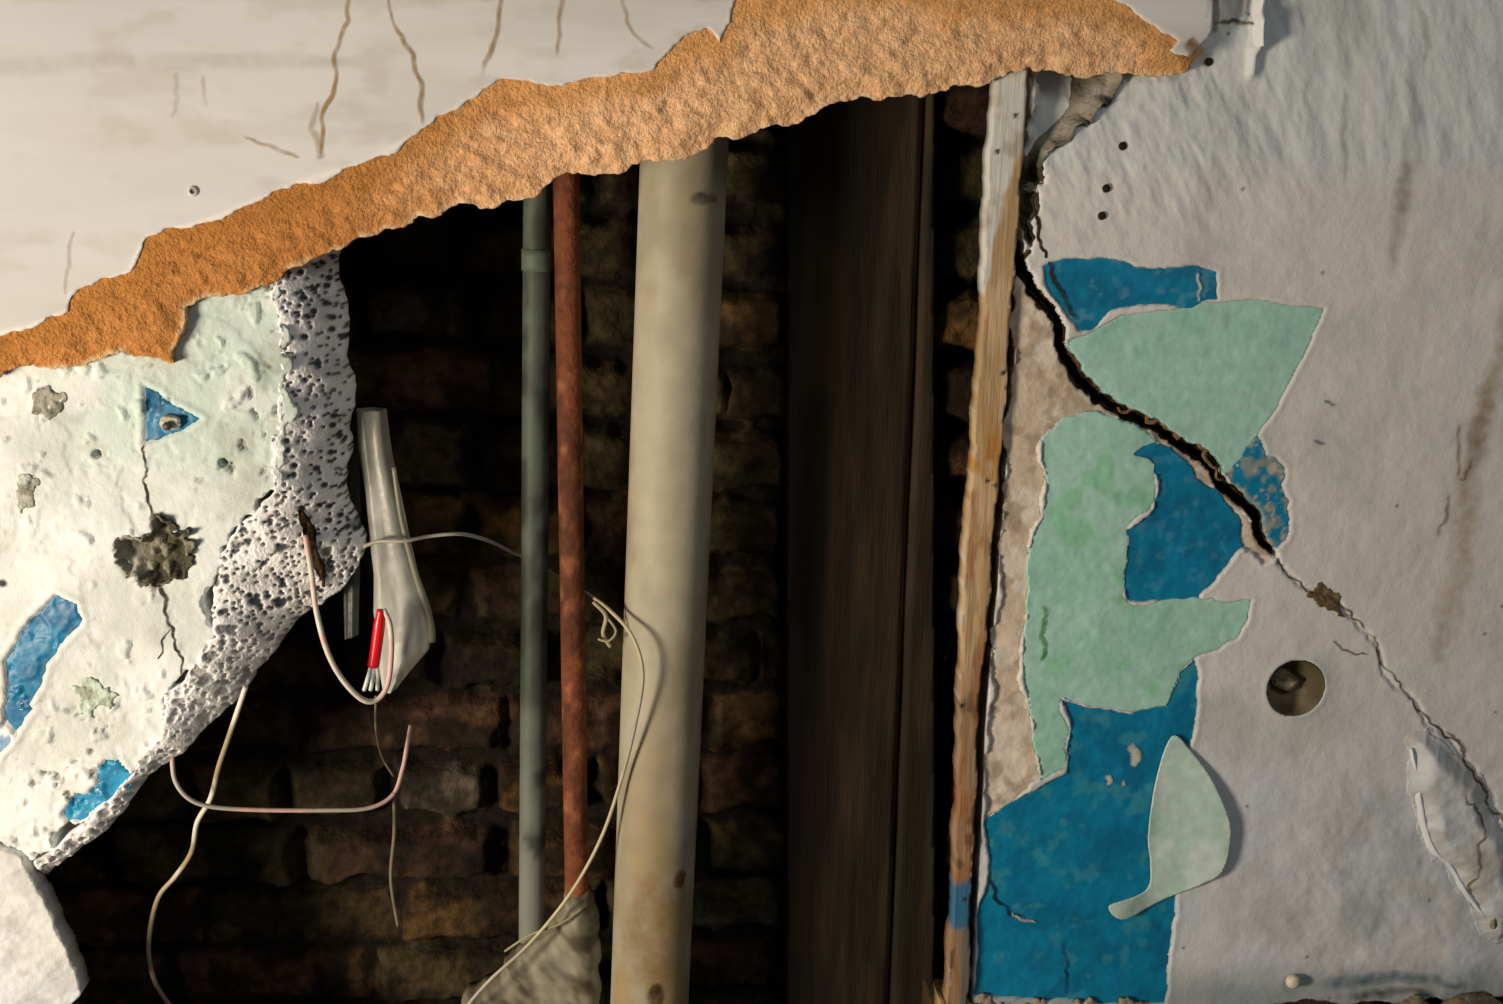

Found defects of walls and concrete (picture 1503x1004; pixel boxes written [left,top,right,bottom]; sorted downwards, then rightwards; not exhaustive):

spalling [16,473,40,514]
peeling [0,595,82,752]
crack [141,446,152,516]
crack [157,587,185,676]
spalling [31,250,367,874]
peeling [973,73,1323,1004]
crack [1015,190,1503,906]